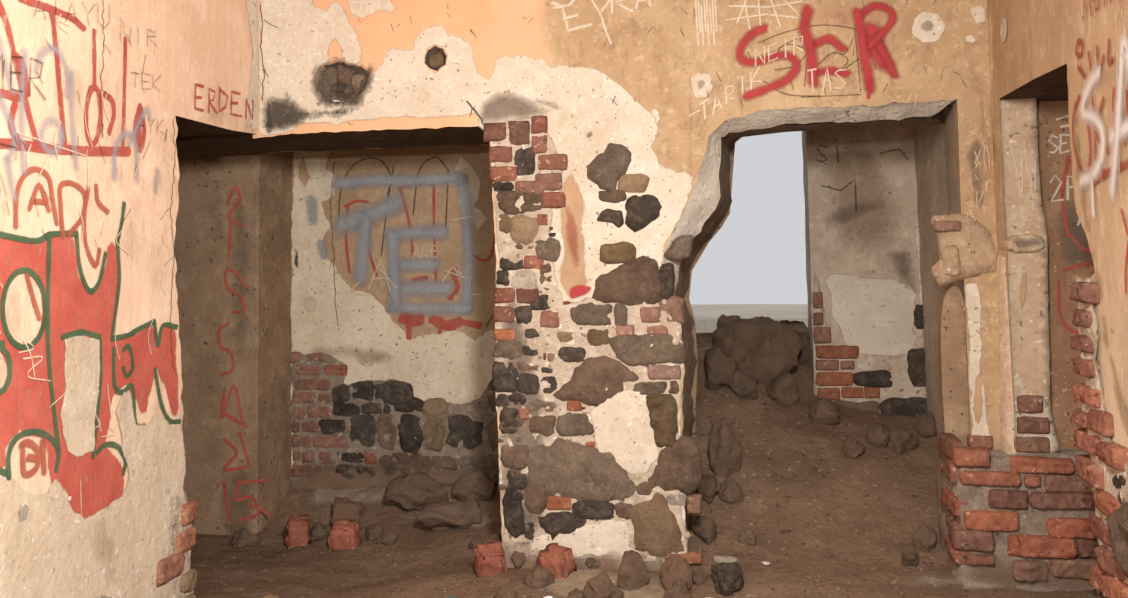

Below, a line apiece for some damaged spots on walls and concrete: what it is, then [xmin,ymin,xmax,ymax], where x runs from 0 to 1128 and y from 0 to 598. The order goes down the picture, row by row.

peeling [0,391,199,598]
flaking render [246,0,703,568]
flaking render [811,273,927,417]
spalling [1013,393,1060,454]
flaking render [1069,274,1128,598]